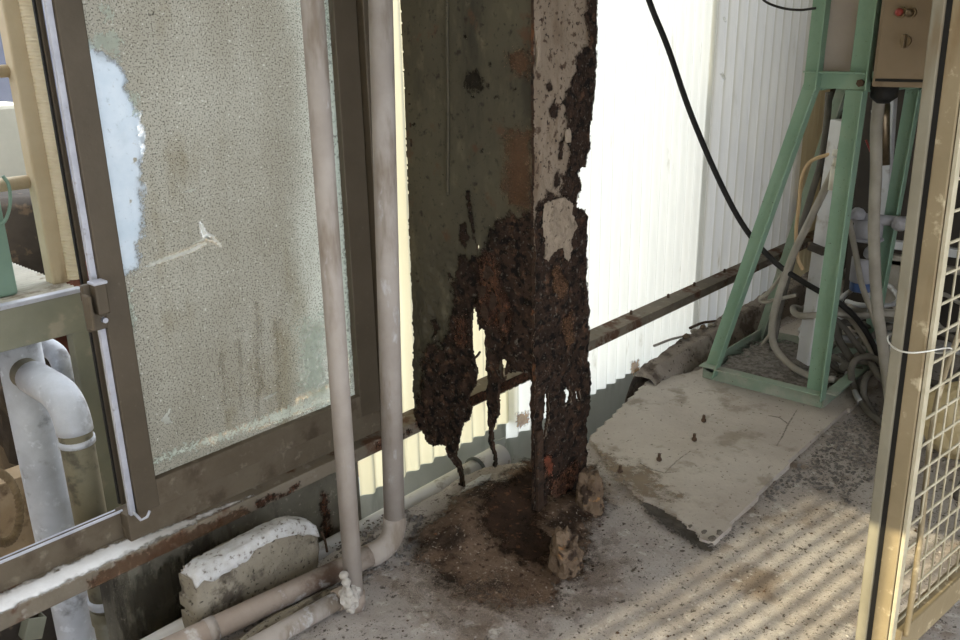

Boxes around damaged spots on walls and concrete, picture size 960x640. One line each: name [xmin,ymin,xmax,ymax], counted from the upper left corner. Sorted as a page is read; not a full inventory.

corrosion [403,0,598,566]
peeling [542,197,578,262]
corrosion [87,481,301,589]
corrosion [319,491,333,539]